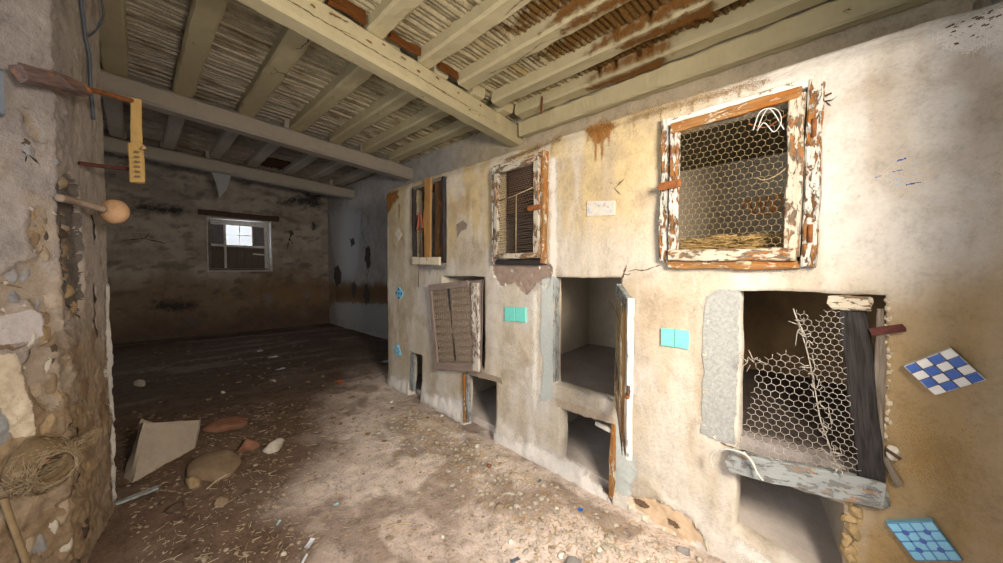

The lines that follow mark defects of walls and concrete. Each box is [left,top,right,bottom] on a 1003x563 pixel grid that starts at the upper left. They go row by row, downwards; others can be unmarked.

corrosion [536,0,722,92]
corrosion [585,116,618,161]
flaking render [349,238,371,269]
flaking render [493,263,709,550]